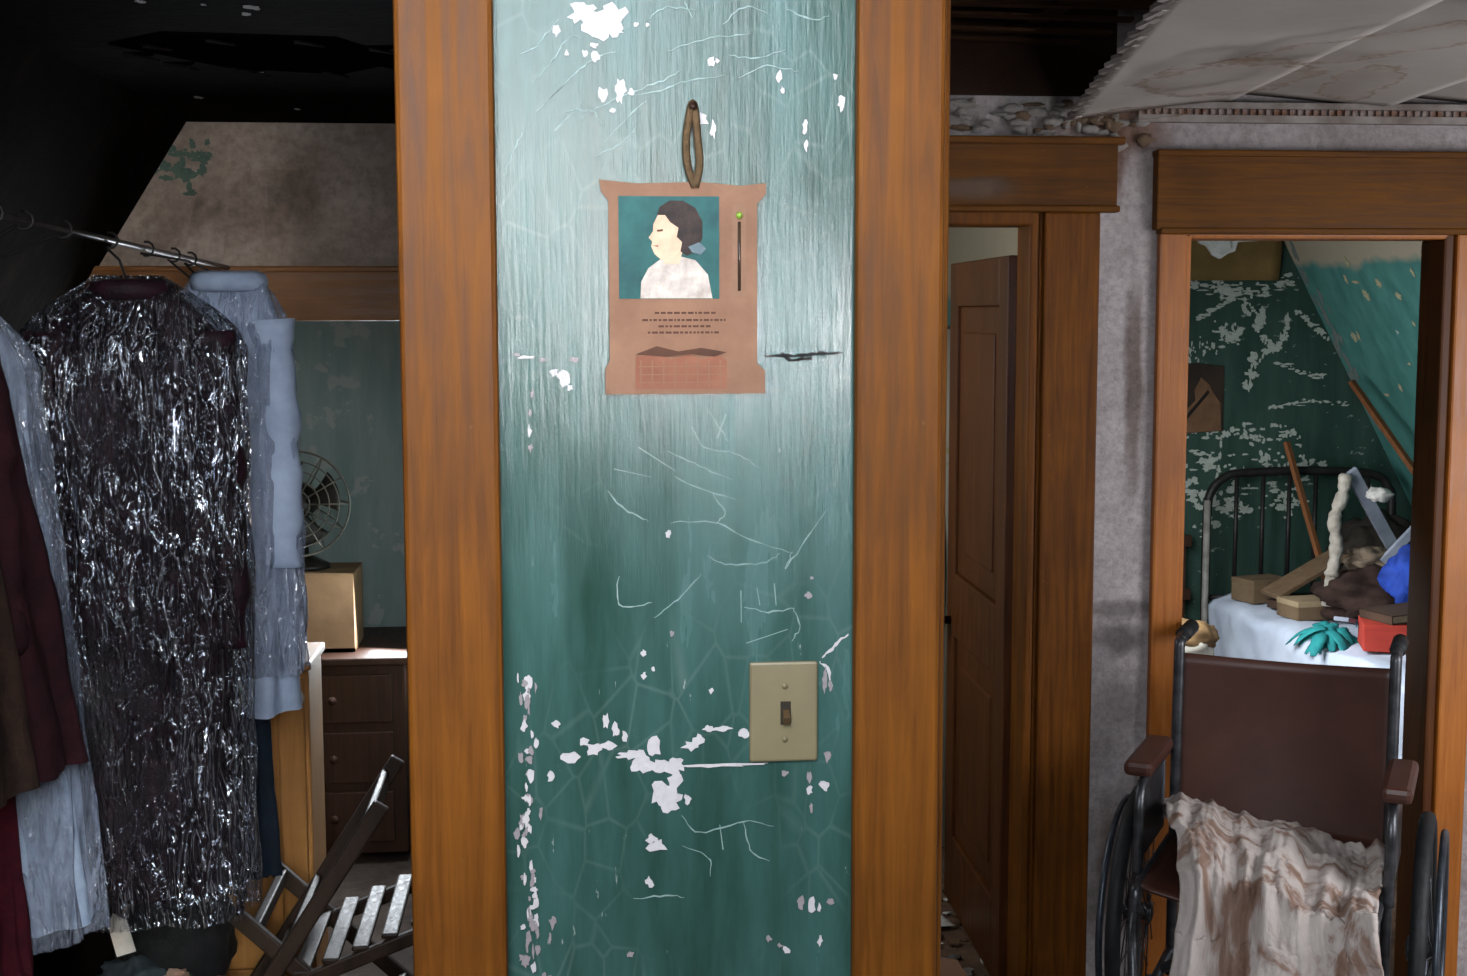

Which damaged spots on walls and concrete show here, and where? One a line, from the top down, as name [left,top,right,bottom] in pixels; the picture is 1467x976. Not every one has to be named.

peeling [552,2,649,62]
peeling [598,78,635,113]
peeling [833,74,845,113]
spalling [950,0,1179,152]
peeling [699,112,716,140]
peeling [1343,257,1402,301]
crack [764,351,843,362]
peeling [1185,241,1381,538]
peeling [822,666,833,694]
peeling [806,771,829,813]
peeling [513,673,765,976]
peeling [797,895,834,913]